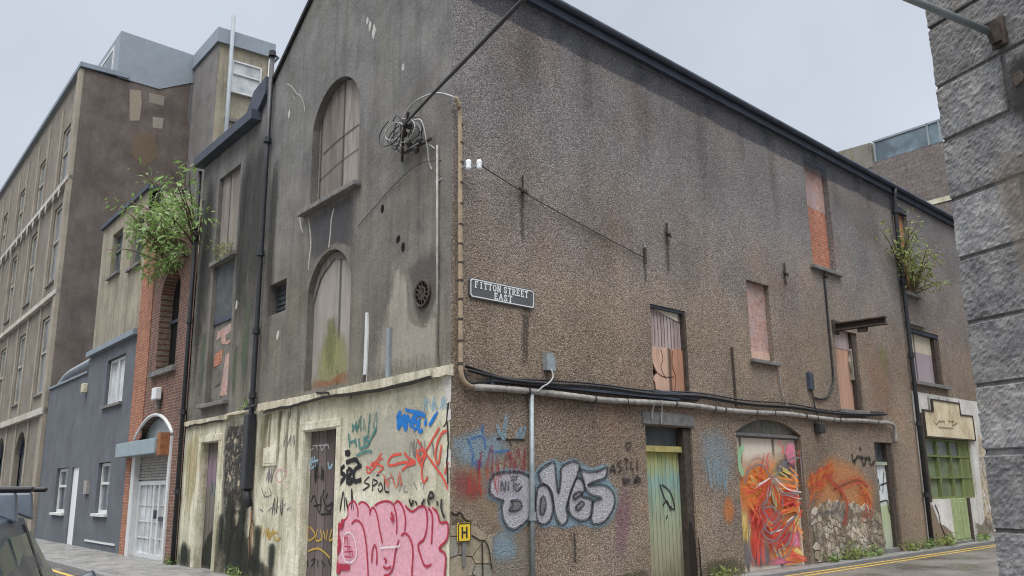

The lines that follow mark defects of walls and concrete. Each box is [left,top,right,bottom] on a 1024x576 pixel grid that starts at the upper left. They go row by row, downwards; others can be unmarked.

water stain [178,491,274,576]